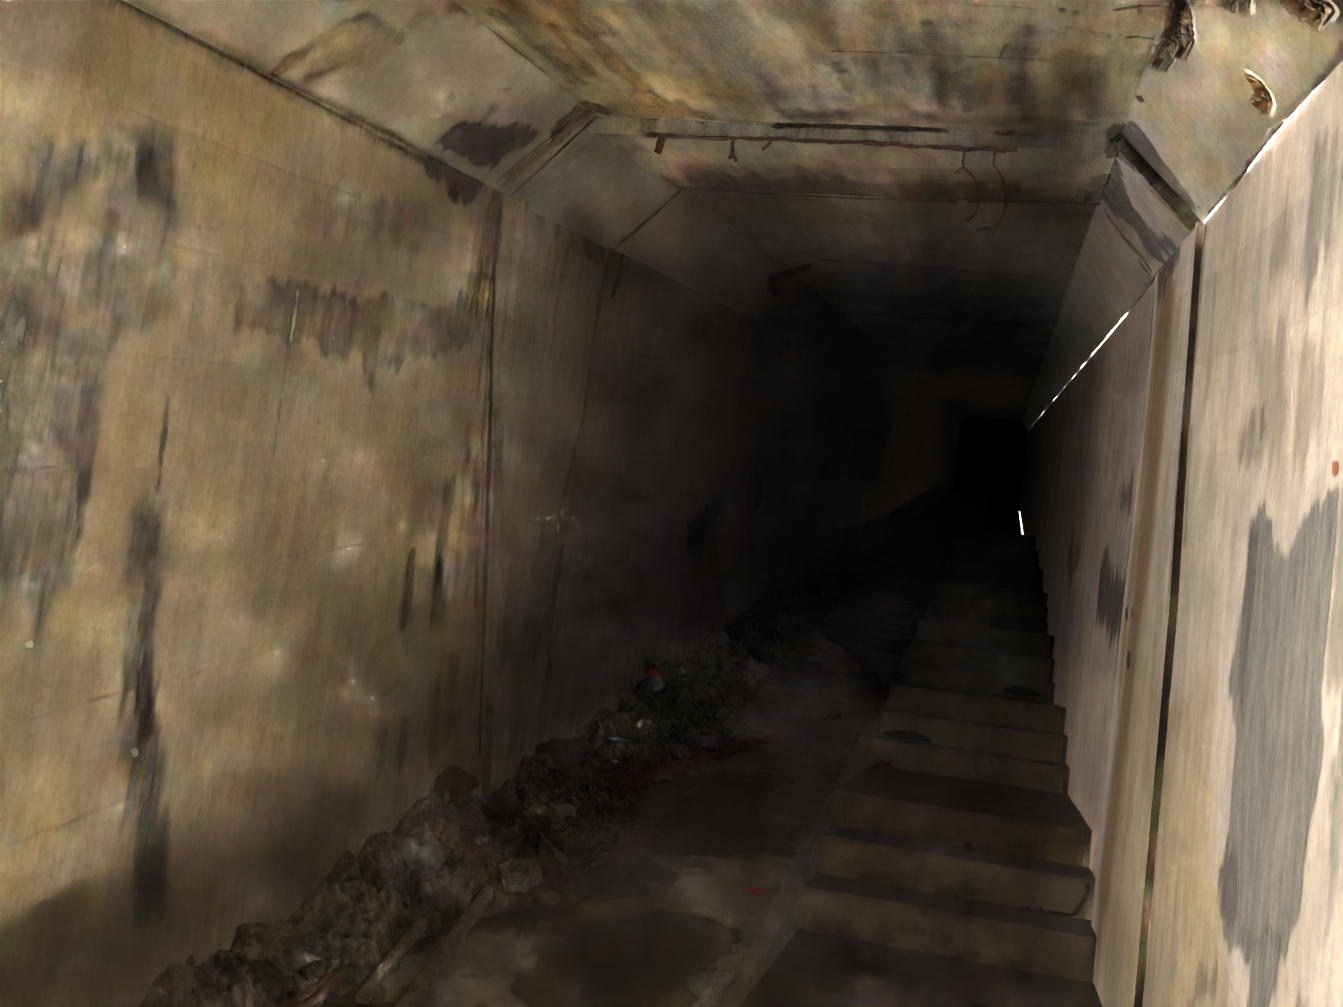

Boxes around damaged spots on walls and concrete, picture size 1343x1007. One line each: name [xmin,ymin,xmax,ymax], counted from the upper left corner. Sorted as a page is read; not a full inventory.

water stain [426,101,614,218]
water stain [1088,121,1200,301]
spalling [1150,0,1251,71]
spalling [1244,74,1272,115]
spalling [1279,0,1332,32]
water stain [0,129,173,639]
water stain [236,234,489,388]
water stain [121,398,168,927]
water stain [1218,489,1340,1007]
water stain [381,770,798,1007]